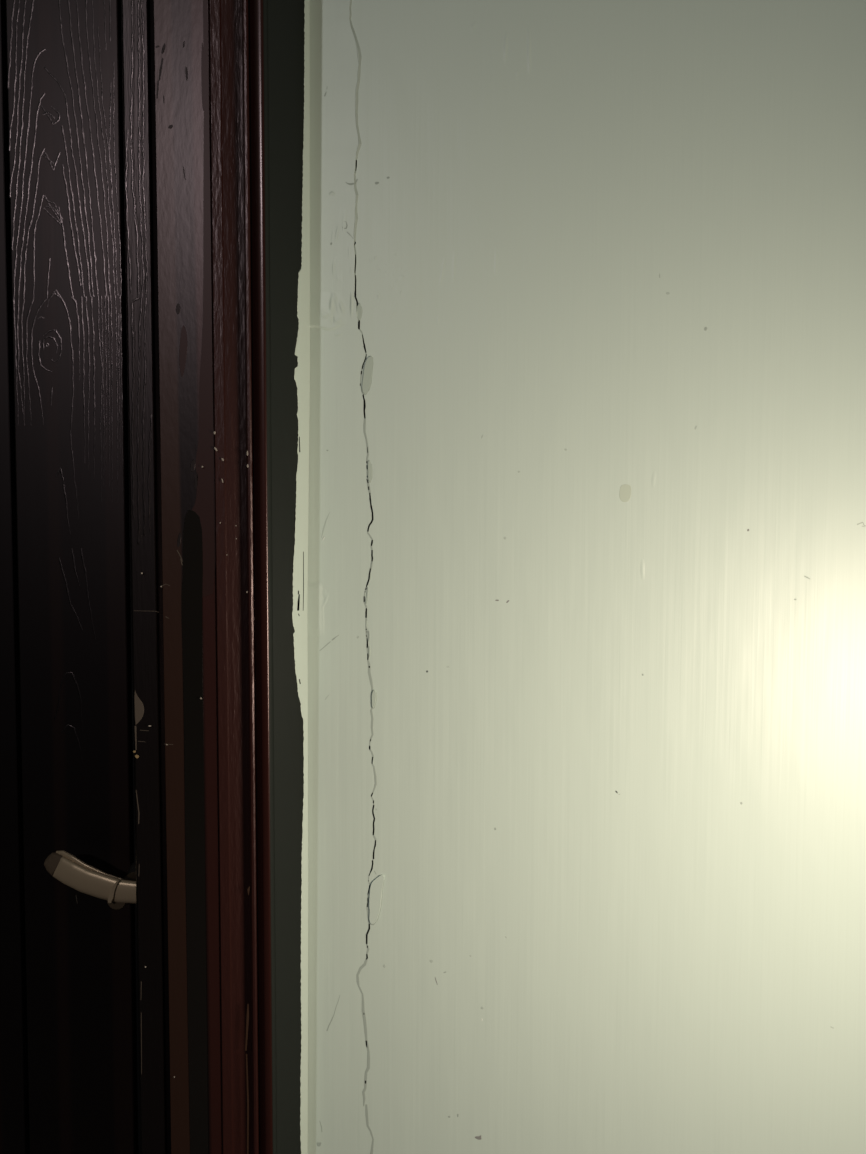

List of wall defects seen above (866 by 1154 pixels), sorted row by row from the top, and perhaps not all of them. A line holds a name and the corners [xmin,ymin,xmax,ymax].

crack [347,0,377,1154]